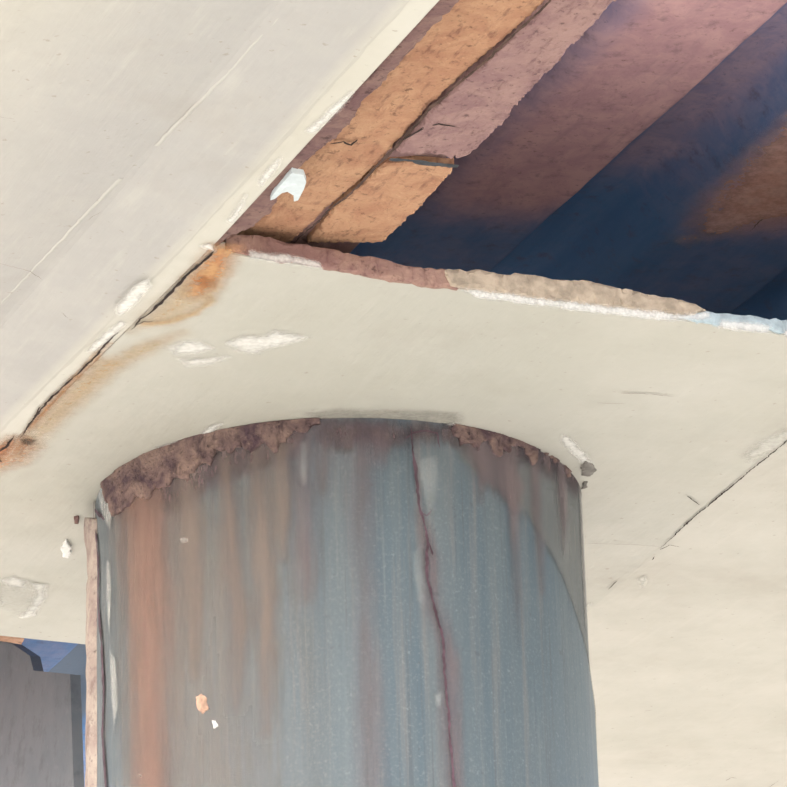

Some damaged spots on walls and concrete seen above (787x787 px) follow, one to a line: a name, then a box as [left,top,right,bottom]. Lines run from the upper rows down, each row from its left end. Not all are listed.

peeling [308,96,348,132]
peeling [270,168,306,201]
peeling [90,281,149,351]
rust [162,247,233,323]
peeling [250,252,321,267]
peeling [444,269,787,334]
crack [0,250,215,462]
rust [0,438,34,468]
rust [100,418,580,531]
crack [652,440,787,560]
peeling [503,436,597,669]
crack [405,428,456,787]